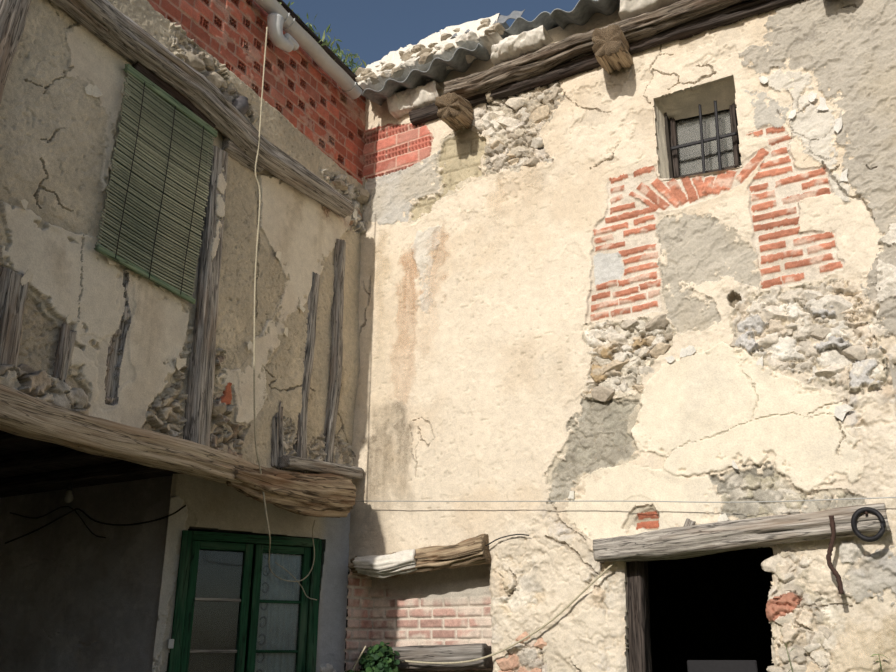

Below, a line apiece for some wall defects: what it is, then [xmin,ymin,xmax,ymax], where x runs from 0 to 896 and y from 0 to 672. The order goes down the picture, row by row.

crack [48,0,80,29]
crack [25,65,74,94]
crack [643,47,717,104]
spalling [363,82,566,313]
flaking render [0,199,194,439]
flaking render [210,167,366,466]
flaking render [544,68,896,540]
crack [409,417,435,471]
crack [667,361,849,457]